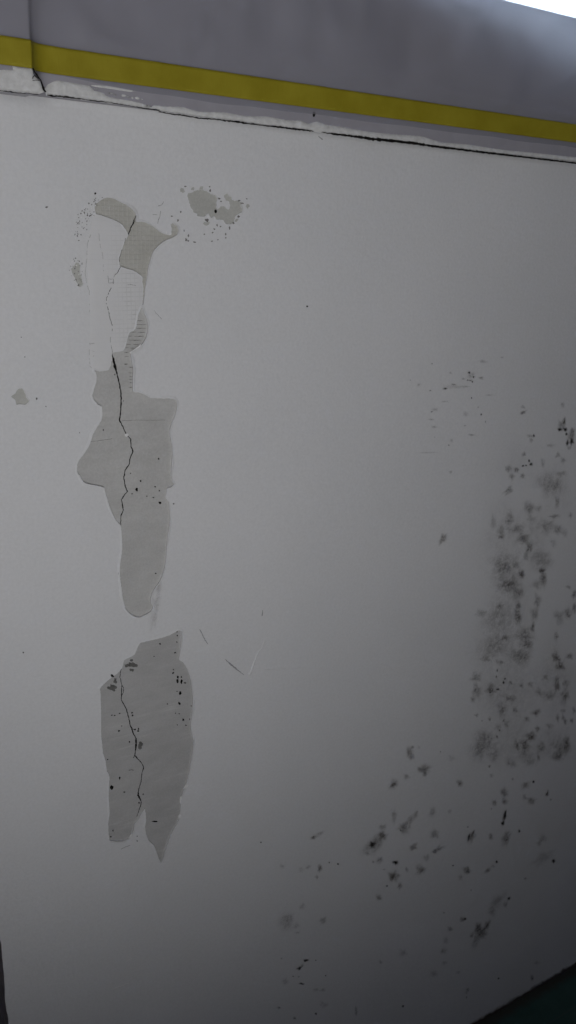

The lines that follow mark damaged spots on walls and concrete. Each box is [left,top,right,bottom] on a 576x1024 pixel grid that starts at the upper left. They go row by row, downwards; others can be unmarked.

crack [0,68,576,164]
crack [85,203,163,524]
peeling [75,186,250,619]
crack [120,671,144,815]
peeling [98,628,196,864]